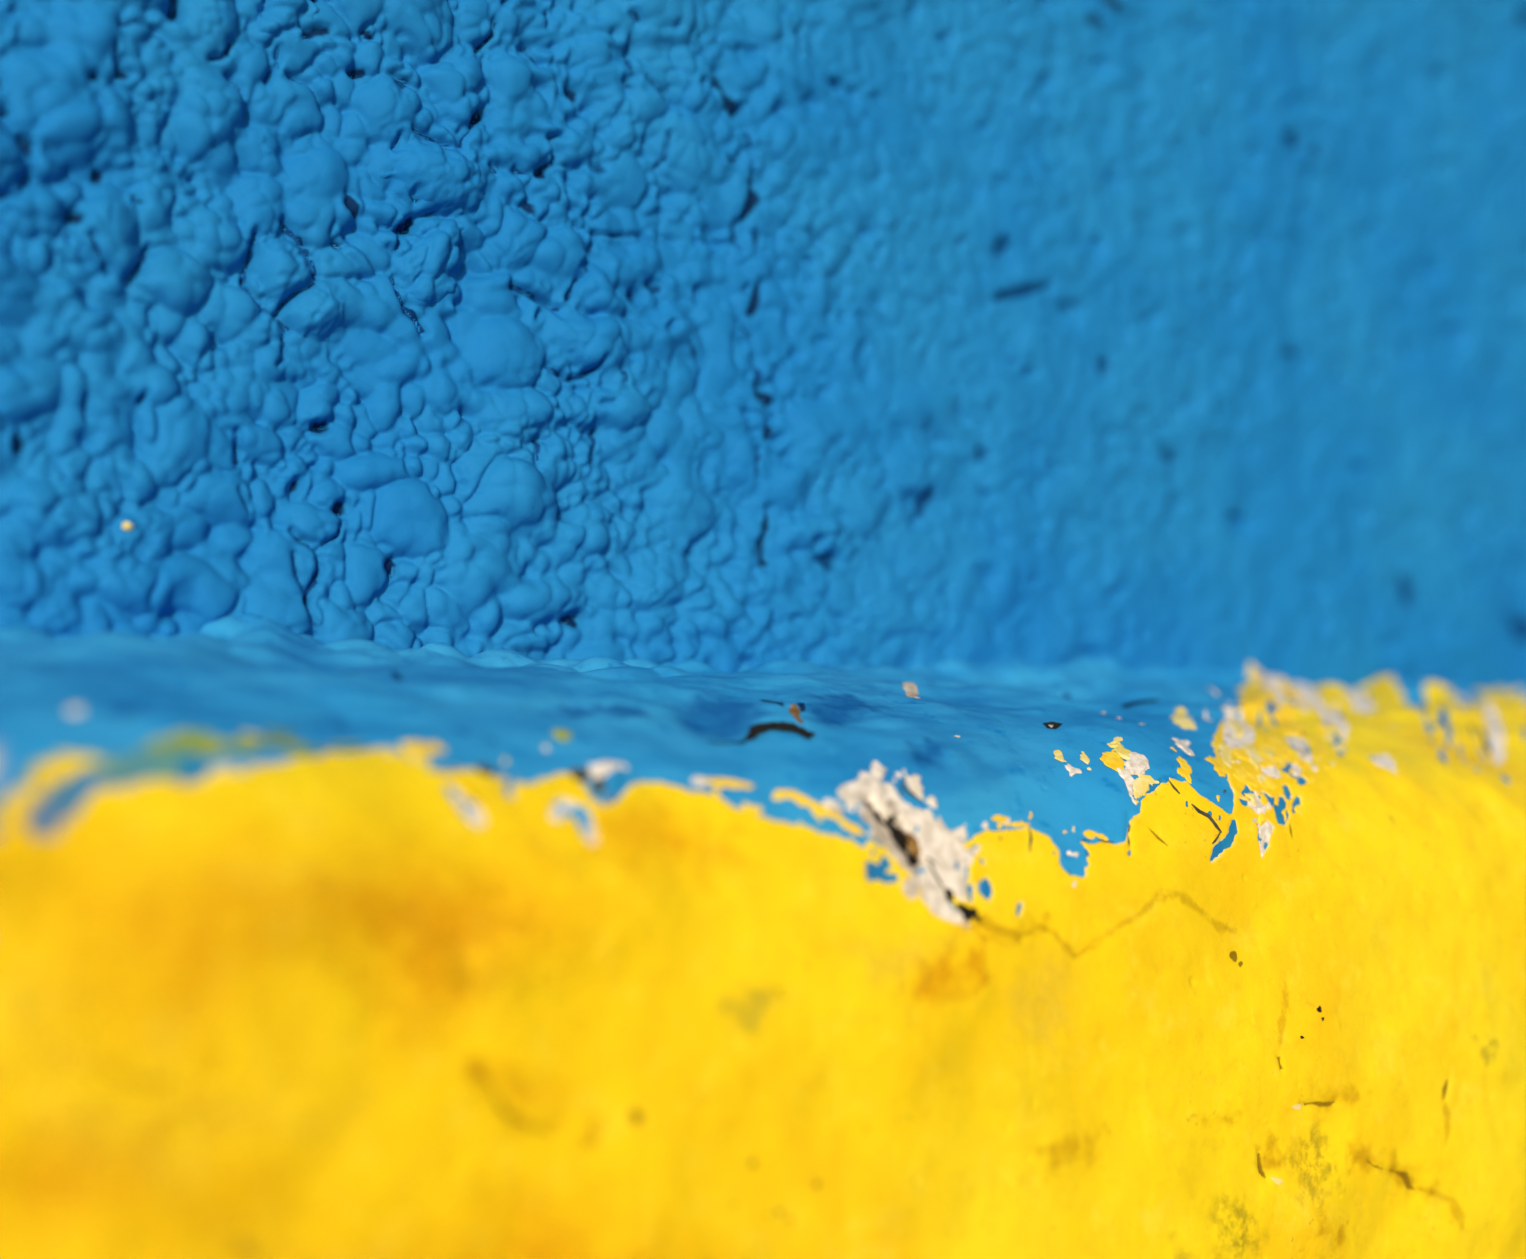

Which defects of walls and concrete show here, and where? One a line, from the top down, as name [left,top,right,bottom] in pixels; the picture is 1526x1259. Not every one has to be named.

peeling [24,771,143,837]
peeling [400,740,447,765]
peeling [454,792,487,828]
peeling [543,729,572,751]
peeling [549,800,598,846]
peeling [569,760,629,804]
spalling [690,761,1033,928]
peeling [1053,826,1108,888]
peeling [1054,663,1397,861]
peeling [1420,685,1526,784]
crack [1358,1154,1414,1189]